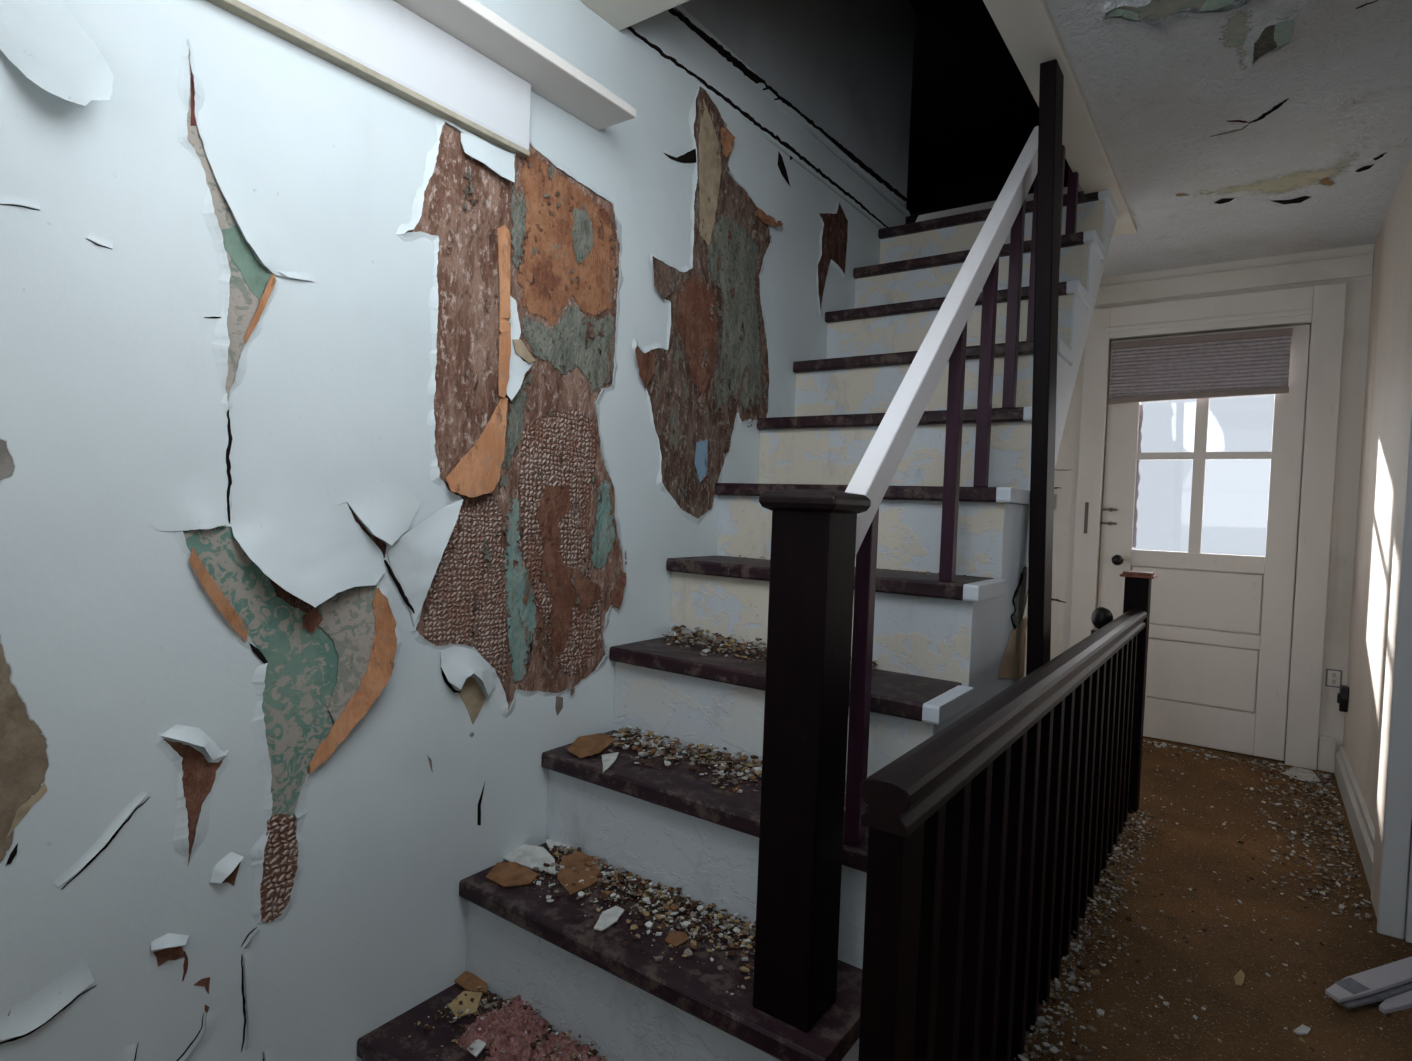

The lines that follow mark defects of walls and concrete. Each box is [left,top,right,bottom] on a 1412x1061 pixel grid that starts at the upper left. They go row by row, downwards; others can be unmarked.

peeling [1092,0,1303,69]
crack [1210,99,1288,137]
flaking render [816,200,849,316]
flaking render [396,85,783,737]
flaking render [155,725,229,868]
flaking render [210,852,244,886]